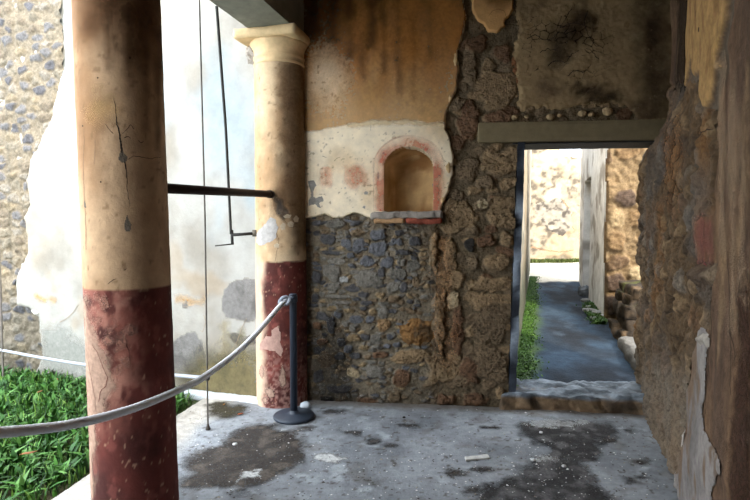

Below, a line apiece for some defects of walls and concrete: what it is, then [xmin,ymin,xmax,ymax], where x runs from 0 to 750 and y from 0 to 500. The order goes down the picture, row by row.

crack [518,9,608,80]
spalling [0,0,70,372]
crack [105,97,160,202]
leakage [274,0,467,248]
spalling [256,0,638,407]
spalling [221,277,256,323]
spalling [633,80,721,500]
peeling [227,326,283,356]
leakage [180,423,316,492]
leakage [444,467,491,477]
leakage [463,421,632,500]